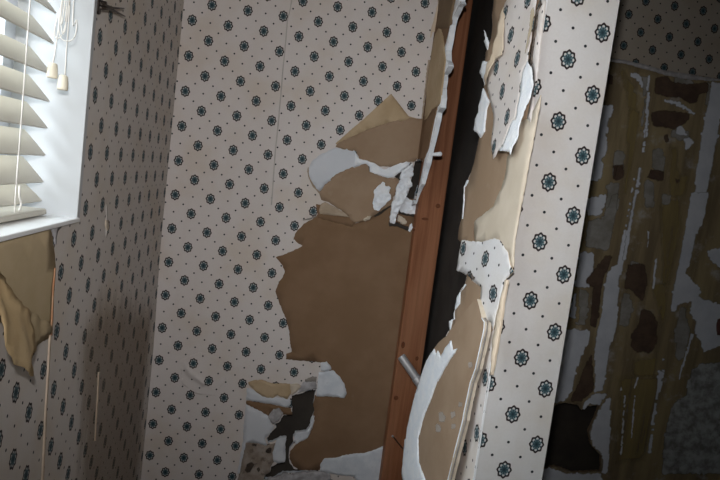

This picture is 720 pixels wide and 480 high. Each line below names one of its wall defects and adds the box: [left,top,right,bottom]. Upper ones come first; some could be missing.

damp [608,70,639,193]
damp [655,76,709,104]
damp [586,255,612,327]
damp [618,110,690,461]
spalling [237,376,331,480]
damp [571,355,594,402]